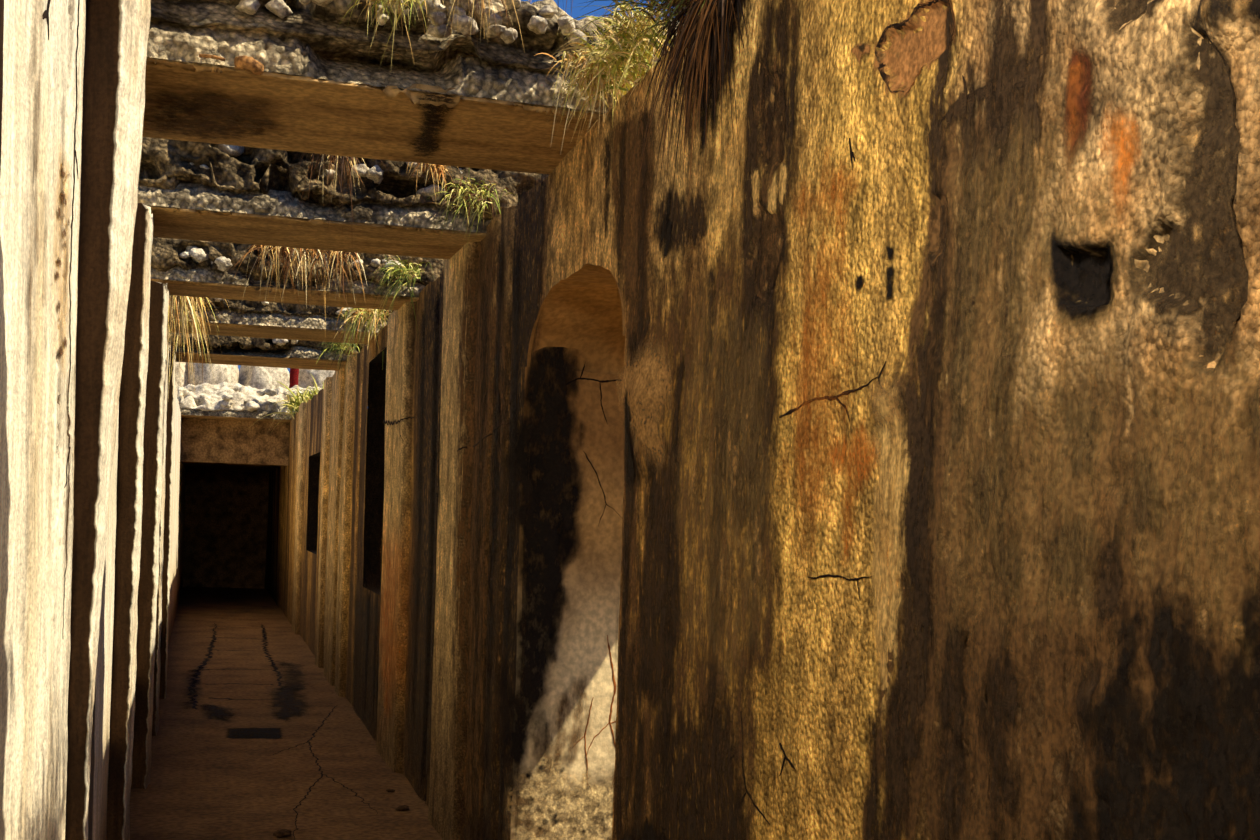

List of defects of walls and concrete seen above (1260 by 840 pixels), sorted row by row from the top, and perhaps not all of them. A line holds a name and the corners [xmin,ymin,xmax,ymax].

spalling [852,0,956,96]
corrosion [1064,51,1090,169]
spalling [1045,10,1248,390]
leakage [603,0,798,840]
crack [779,361,902,421]
leakage [862,0,1260,840]
crack [187,623,378,840]
leakage [272,661,307,720]
leakage [536,683,584,771]